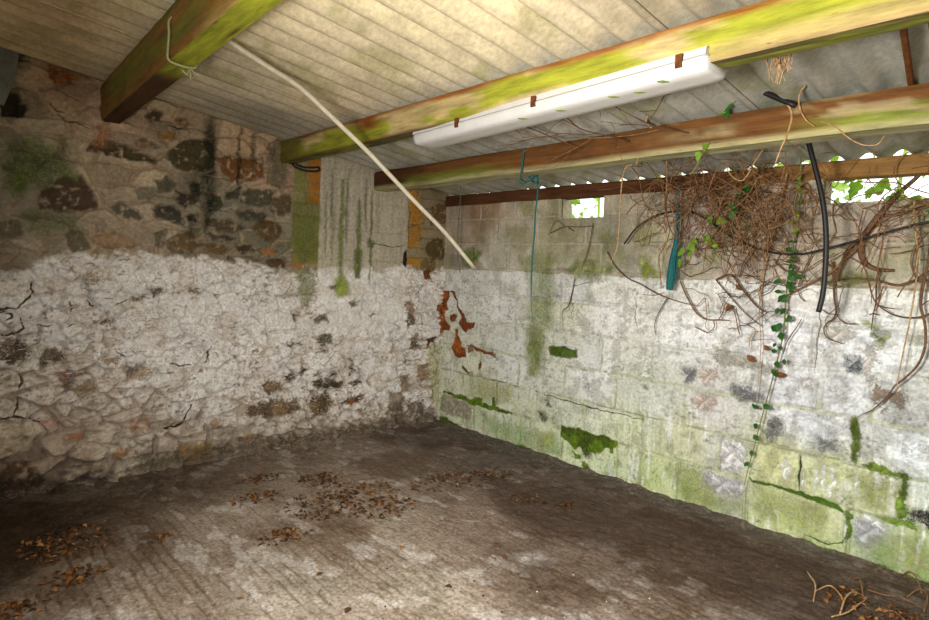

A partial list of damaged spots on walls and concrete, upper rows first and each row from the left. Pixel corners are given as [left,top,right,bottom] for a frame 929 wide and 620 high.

damp [325,180,374,282]
peeling [404,290,496,374]
crack [1,373,47,429]
damp [765,414,786,443]
damp [801,465,837,498]
damp [905,506,929,528]